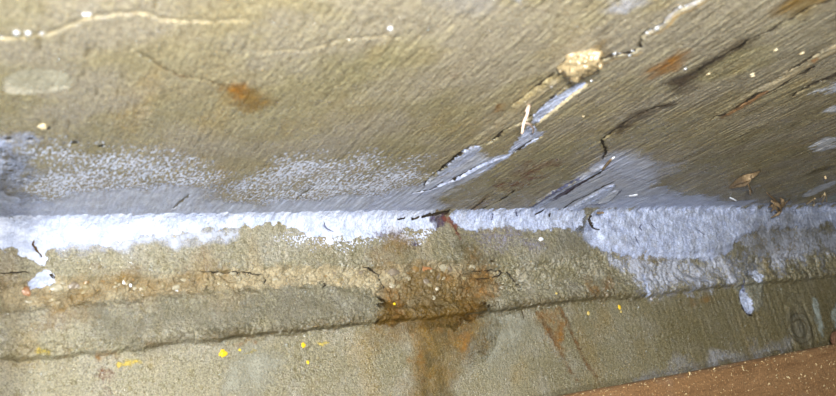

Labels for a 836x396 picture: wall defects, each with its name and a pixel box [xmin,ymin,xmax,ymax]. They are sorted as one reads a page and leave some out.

crack [0,12,406,52]
crack [602,0,708,65]
crack [697,0,831,72]
crack [139,52,226,87]
crack [511,73,572,116]
crack [710,52,836,121]
crack [600,106,661,160]
damp [0,43,836,300]
crack [413,146,481,193]
spalling [2,260,520,307]
spalling [737,279,764,316]
corrosion [536,307,598,377]